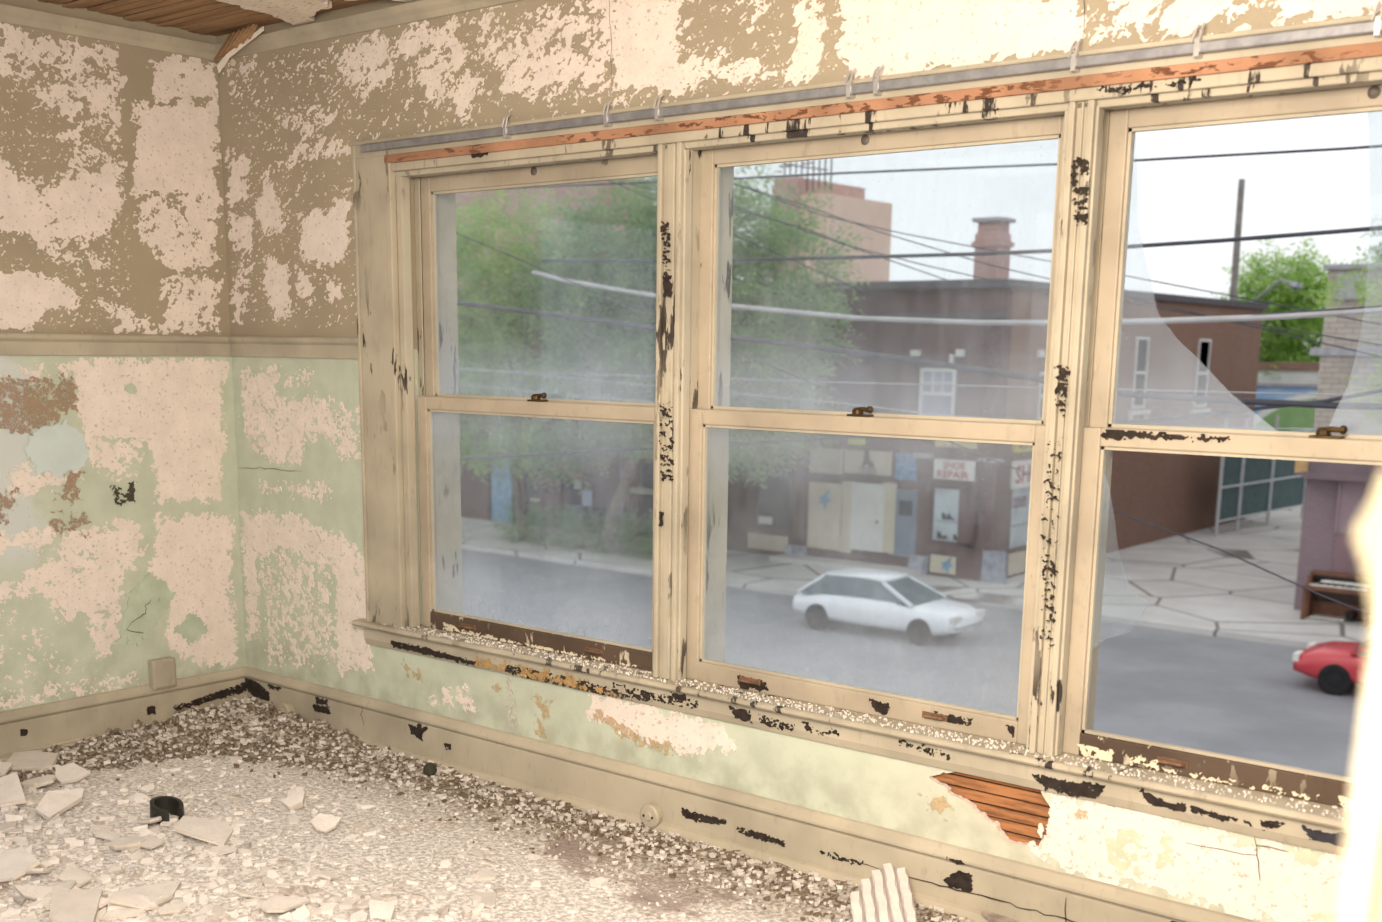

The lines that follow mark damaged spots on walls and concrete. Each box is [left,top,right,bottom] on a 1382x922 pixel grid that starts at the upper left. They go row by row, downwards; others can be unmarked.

peeling [0,0,1382,335]
peeling [659,403,674,481]
peeling [1054,365,1071,417]
peeling [1100,429,1230,443]
peeling [0,357,375,710]
peeling [1040,437,1063,649]
peeling [1353,475,1382,667]
peeling [391,640,478,667]
peeling [505,665,839,762]
peeling [869,698,890,715]
peeling [934,711,973,726]
peeling [898,740,1346,922]